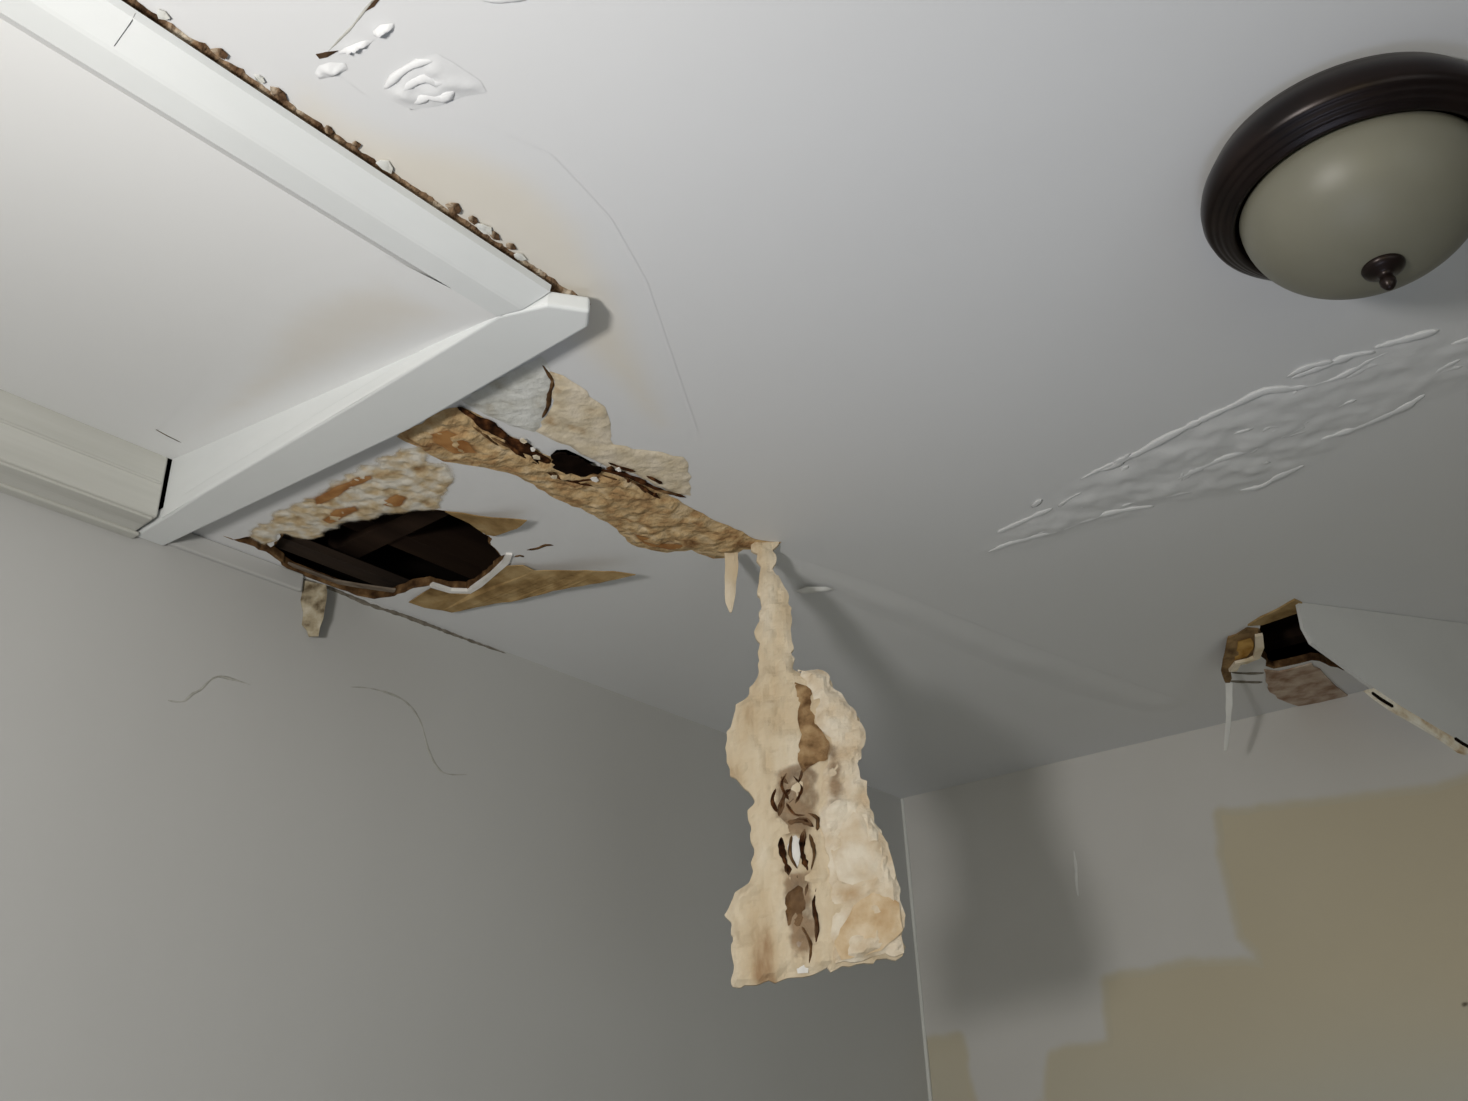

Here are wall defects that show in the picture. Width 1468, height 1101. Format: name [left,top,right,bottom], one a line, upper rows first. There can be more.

crack [315,0,394,79]
flaking render [462,356,554,432]
spalling [224,532,504,637]
spalling [1261,651,1345,671]
peeling [901,688,1468,1101]